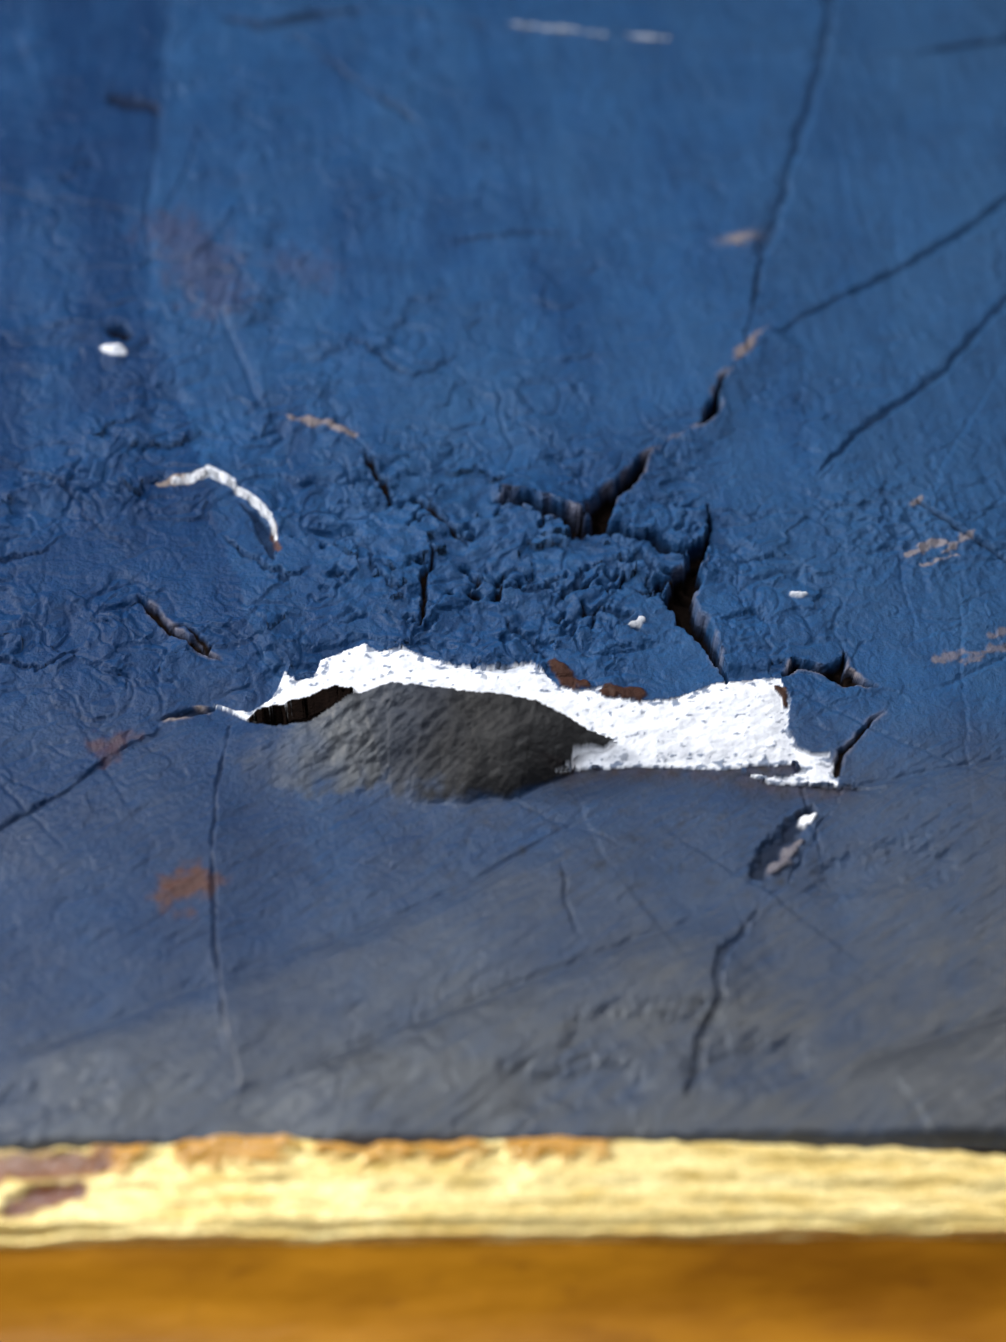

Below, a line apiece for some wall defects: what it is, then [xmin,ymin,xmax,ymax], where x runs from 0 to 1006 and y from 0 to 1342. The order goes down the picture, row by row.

crack [215,0,1006,685]
crack [0,762,97,833]
crack [128,704,243,1102]
peeling [215,643,840,789]
crack [681,647,890,1099]